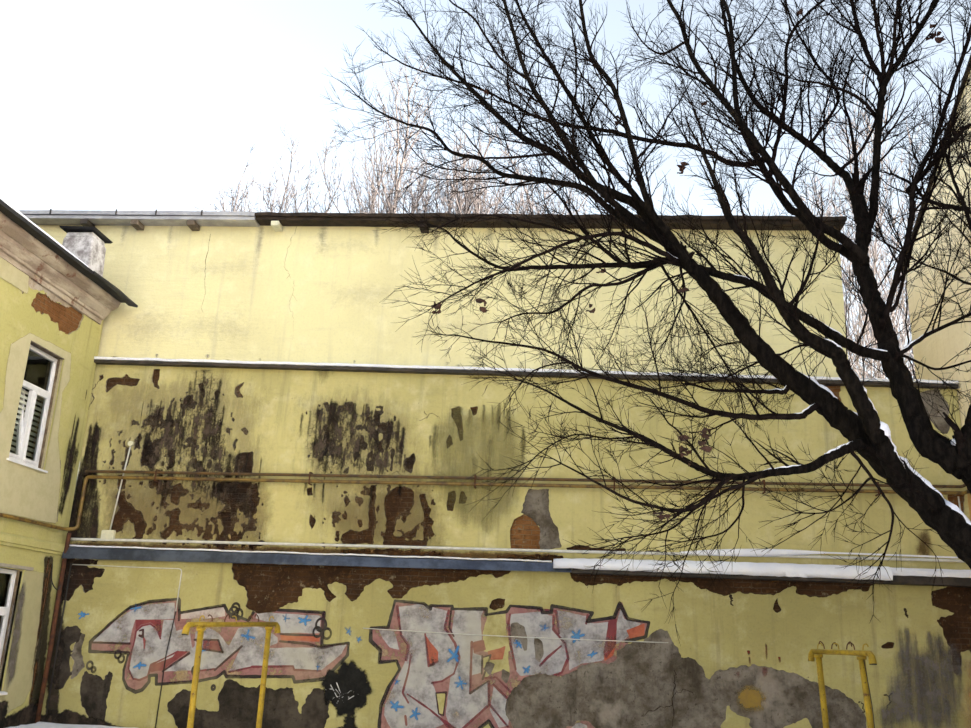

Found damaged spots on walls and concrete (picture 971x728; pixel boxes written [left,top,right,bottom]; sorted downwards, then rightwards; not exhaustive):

leakage [59,415,101,542]
flaking render [103,383,265,550]
leakage [138,370,262,523]
leakage [300,399,406,497]
flaking render [309,485,467,556]
flaking render [500,489,626,562]
flaking render [232,563,511,614]
flaking render [570,572,873,613]
flaking render [57,626,113,720]
flaking render [167,679,330,728]
flaking render [484,629,866,728]
leakage [881,631,971,728]